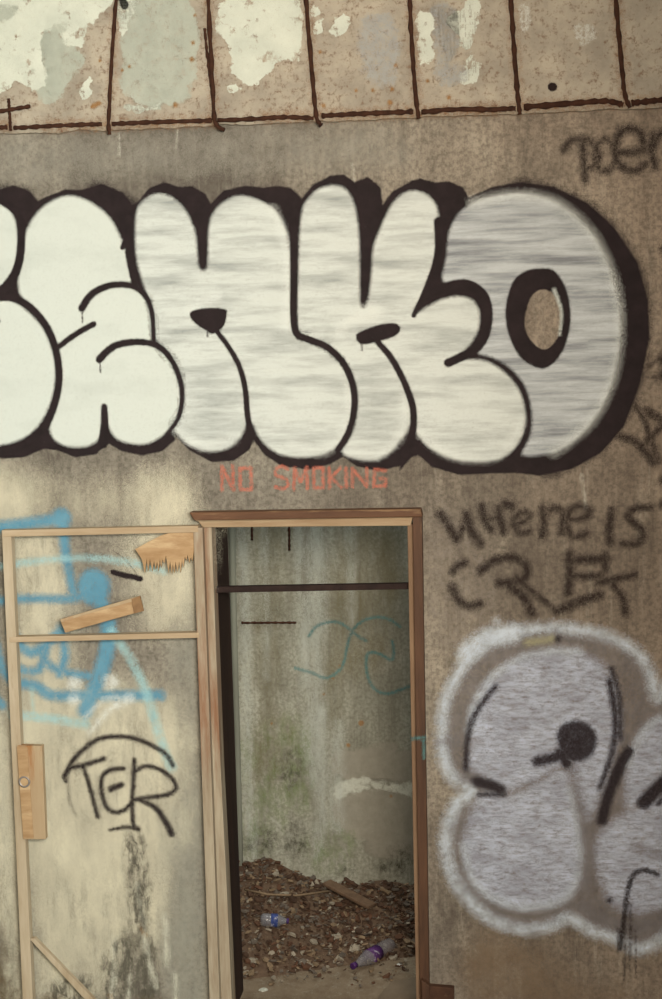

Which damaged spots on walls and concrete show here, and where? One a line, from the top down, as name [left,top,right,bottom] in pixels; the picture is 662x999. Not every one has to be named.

rust [41,0,220,135]
spalling [0,0,662,135]
rust [255,0,662,126]
water stain [40,560,210,999]
water stain [240,957,416,999]